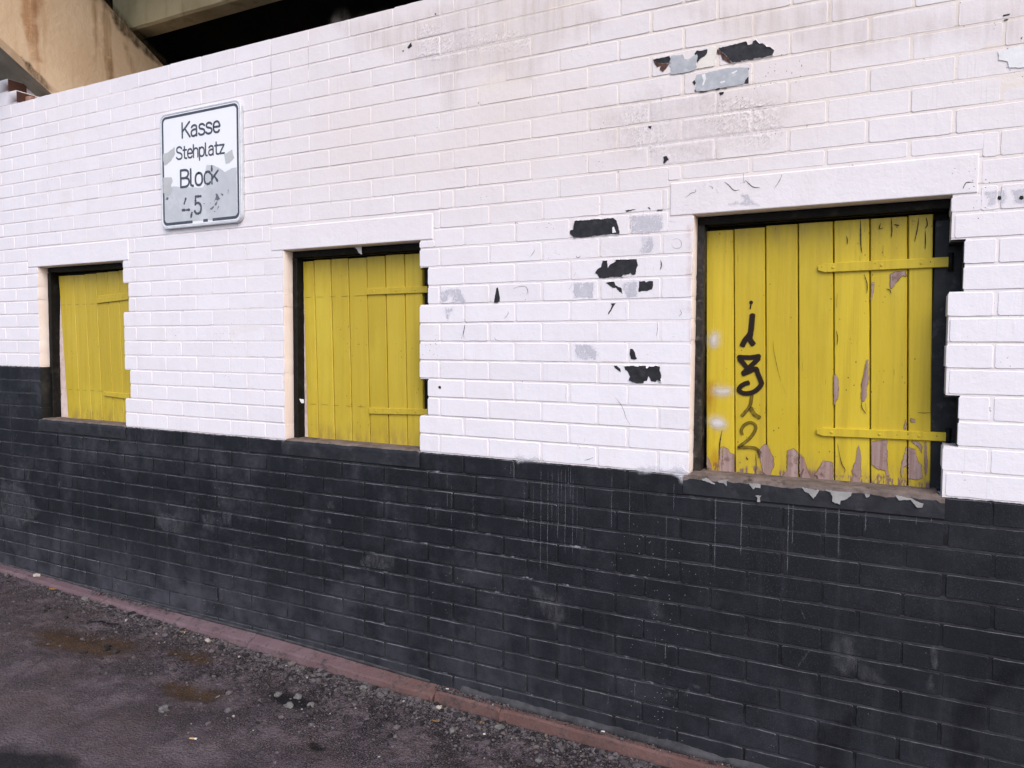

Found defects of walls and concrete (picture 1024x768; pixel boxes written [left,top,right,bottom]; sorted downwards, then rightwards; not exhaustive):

peeling [653,39,774,95]
peeling [570,207,662,314]
peeling [890,271,907,289]
peeling [614,349,662,383]
peeling [861,360,869,402]
leakage [640,468,687,482]
peeling [702,446,735,486]
peeling [749,440,928,504]
flaking render [896,495,923,508]